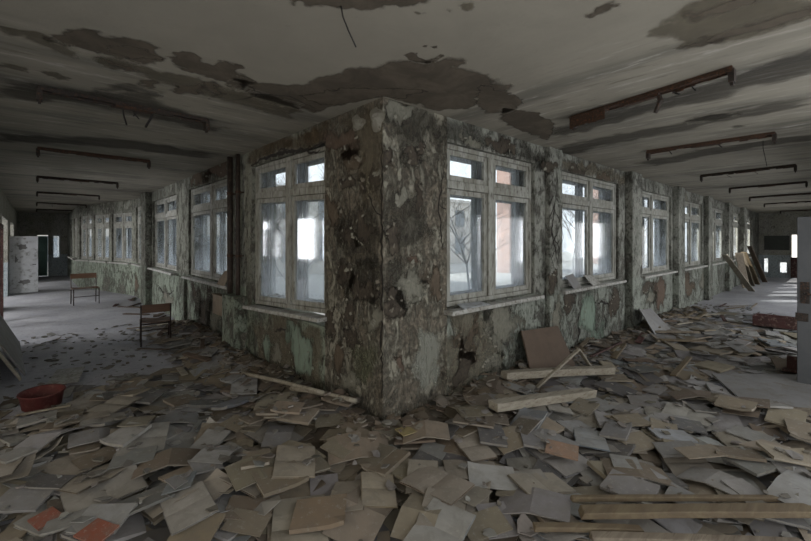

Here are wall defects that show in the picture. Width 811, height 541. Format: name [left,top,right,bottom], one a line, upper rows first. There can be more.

peeling [385,99,415,127]
peeling [325,143,396,231]
peeling [394,179,426,218]
peeling [642,276,666,312]
leakage [252,315,322,390]
peeling [437,305,526,390]